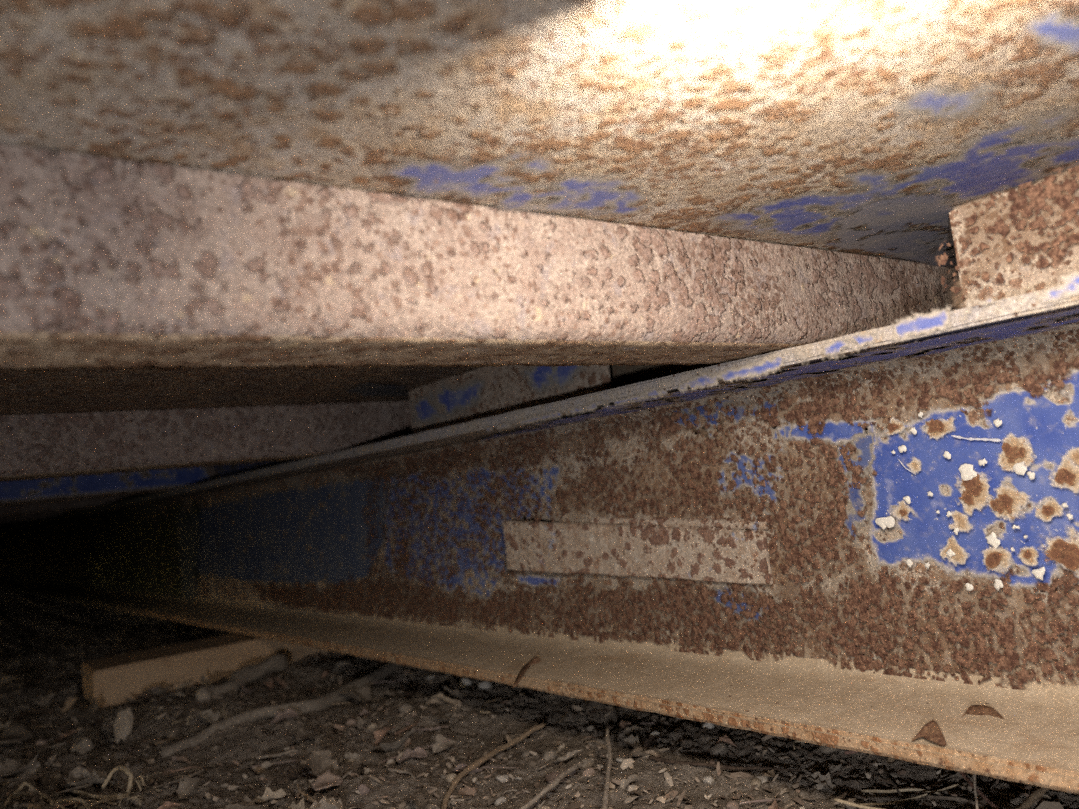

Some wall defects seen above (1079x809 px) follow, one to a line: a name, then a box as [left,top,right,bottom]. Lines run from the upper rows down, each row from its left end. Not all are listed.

peeling [1025,10,1079,54]
peeling [894,84,994,121]
peeling [384,151,653,215]
peeling [713,109,1079,268]
rust [936,162,1079,300]
peeling [474,271,1079,591]
peeling [0,459,303,502]
peeling [384,461,562,600]
rust [253,322,1079,690]
rust [912,720,947,747]
rust [962,705,1004,719]